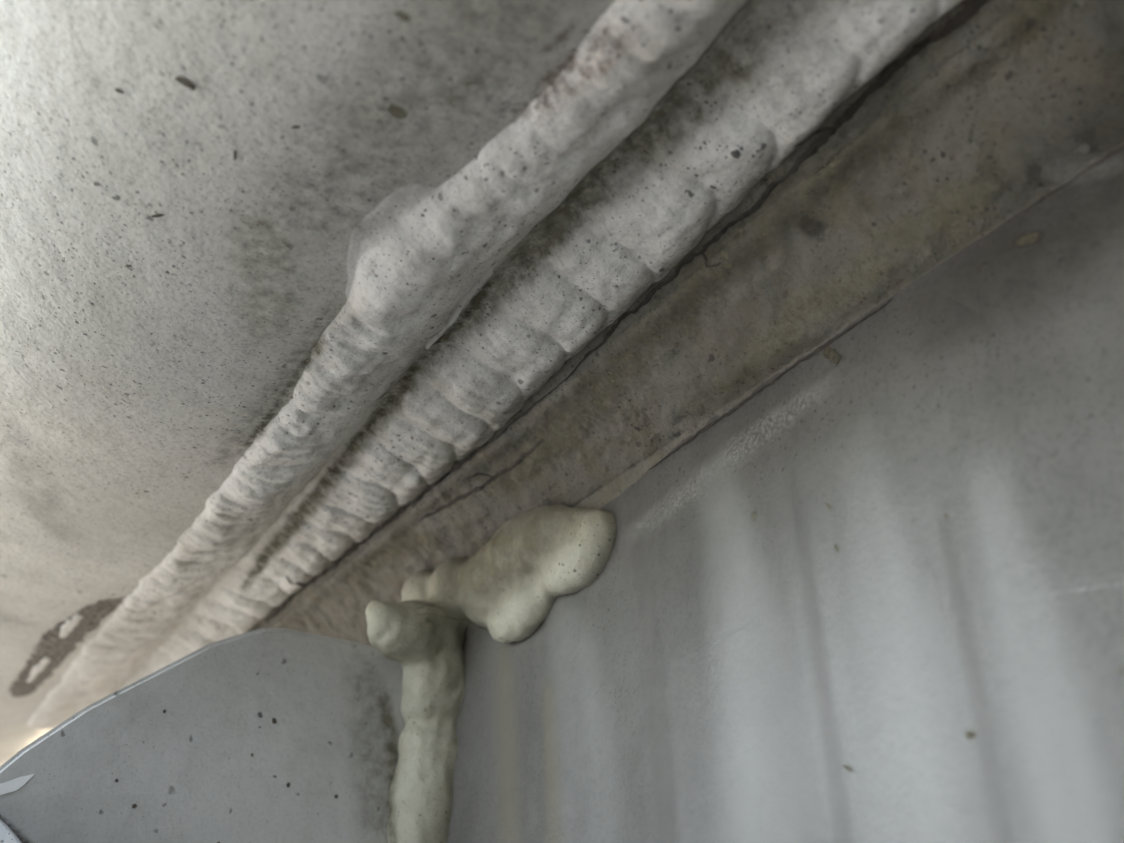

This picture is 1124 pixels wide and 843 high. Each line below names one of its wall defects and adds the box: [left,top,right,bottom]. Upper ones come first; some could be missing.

crack [265,0,989,622]
peeling [7,599,122,697]